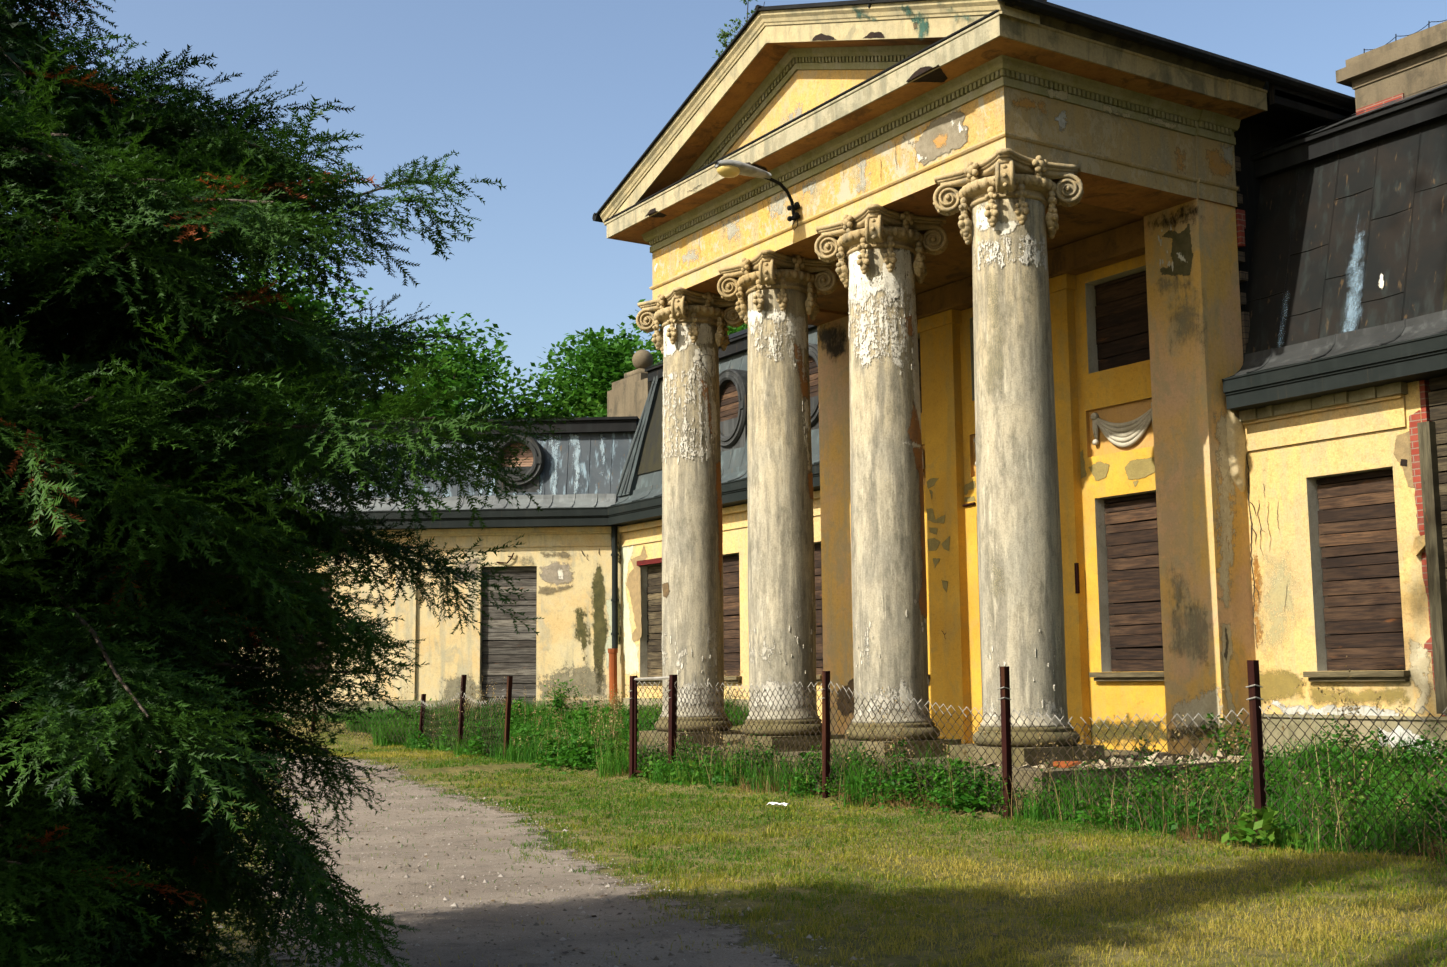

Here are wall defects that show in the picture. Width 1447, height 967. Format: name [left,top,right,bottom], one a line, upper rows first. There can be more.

flaking render [903,110,969,166]
peeling [974,204,1047,271]
flaking render [1158,223,1194,276]
water stain [1344,238,1384,332]
peeling [662,323,723,589]
peeling [747,307,814,502]
peeling [848,248,950,645]
flaking render [539,551,573,595]
water stain [538,563,621,701]
peeling [836,620,930,717]